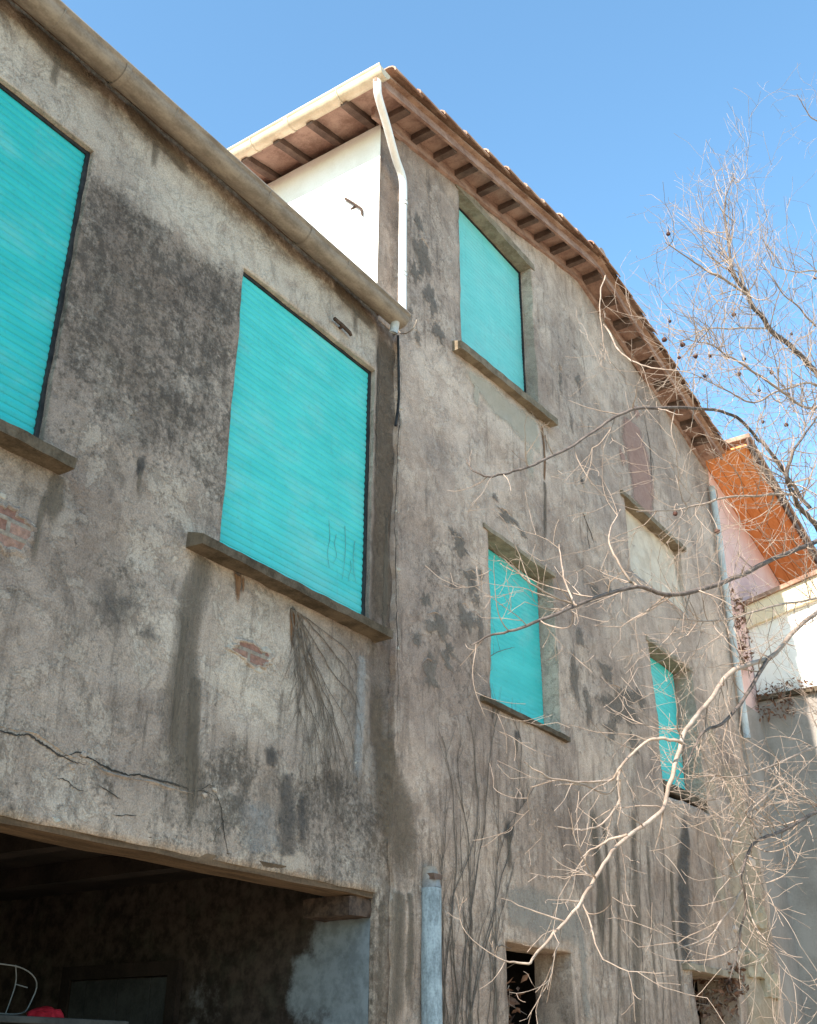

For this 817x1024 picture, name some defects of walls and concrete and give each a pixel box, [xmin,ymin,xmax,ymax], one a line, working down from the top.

flaking render [0,492,41,559]
leakage [169,554,208,806]
flaking render [223,637,275,673]
crack [0,725,229,855]
leakage [267,748,277,764]
leakage [281,775,304,853]